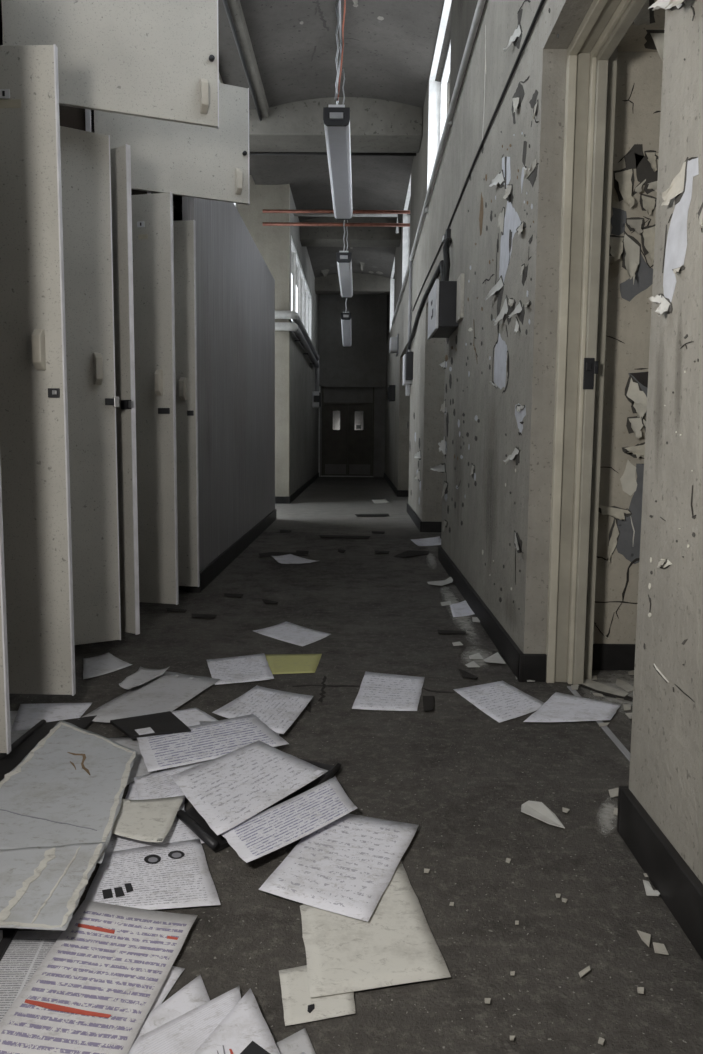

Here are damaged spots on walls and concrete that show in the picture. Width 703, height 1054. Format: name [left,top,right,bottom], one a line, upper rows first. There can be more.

peeling [503,0,531,52]
peeling [407,76,539,533]
peeling [609,144,703,316]
peeling [597,372,665,617]
crack [594,558,640,639]